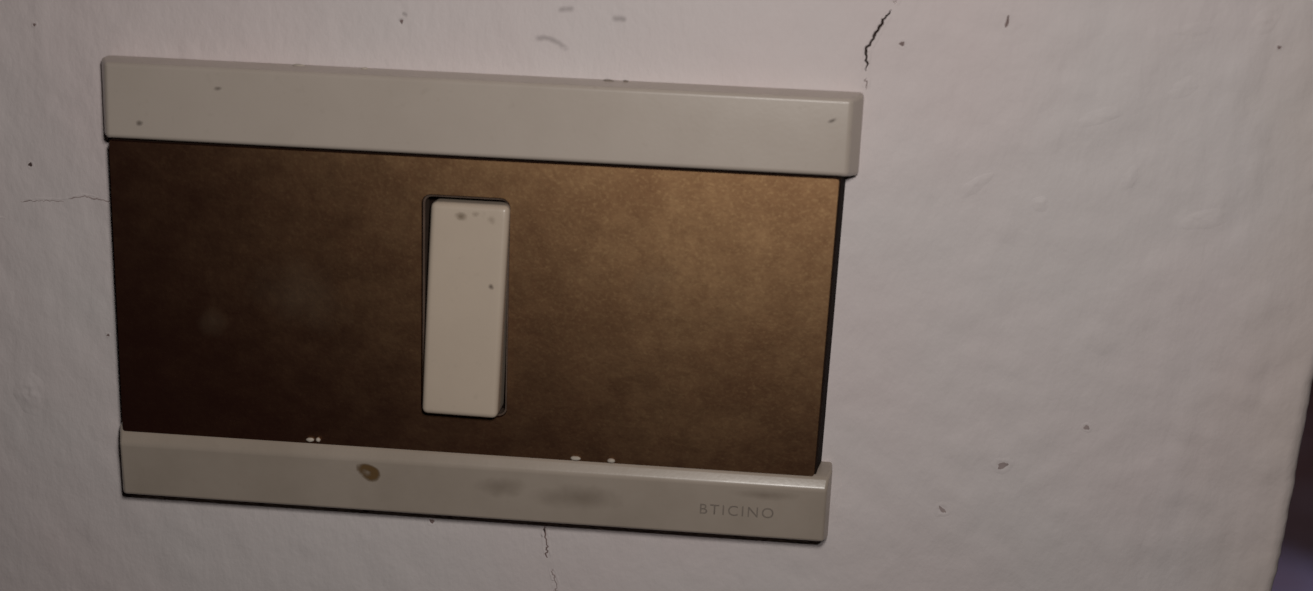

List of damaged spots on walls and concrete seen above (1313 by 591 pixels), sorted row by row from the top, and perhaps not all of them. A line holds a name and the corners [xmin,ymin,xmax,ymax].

crack [860,0,902,89]
crack [541,525,561,591]